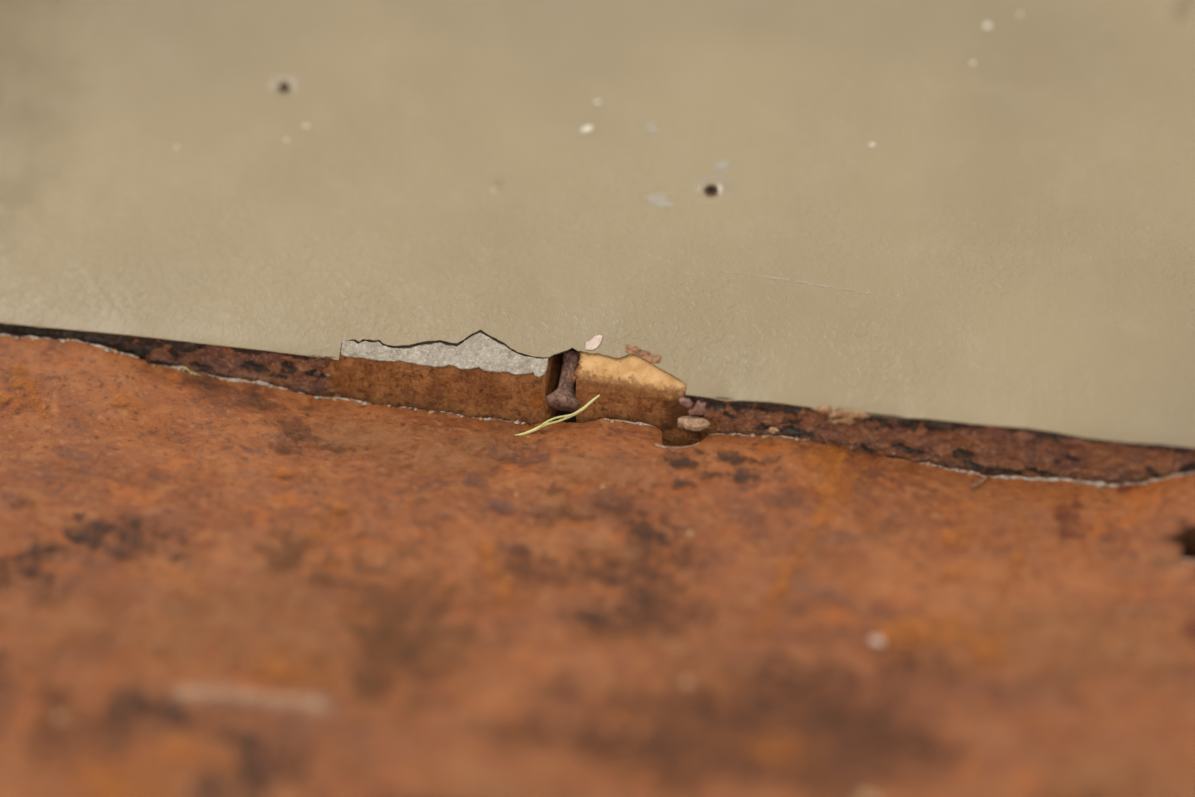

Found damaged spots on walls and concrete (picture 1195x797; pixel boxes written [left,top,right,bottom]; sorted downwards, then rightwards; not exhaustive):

spalling [0,333,548,426]
spalling [573,335,807,447]
corrosion [0,324,1195,797]